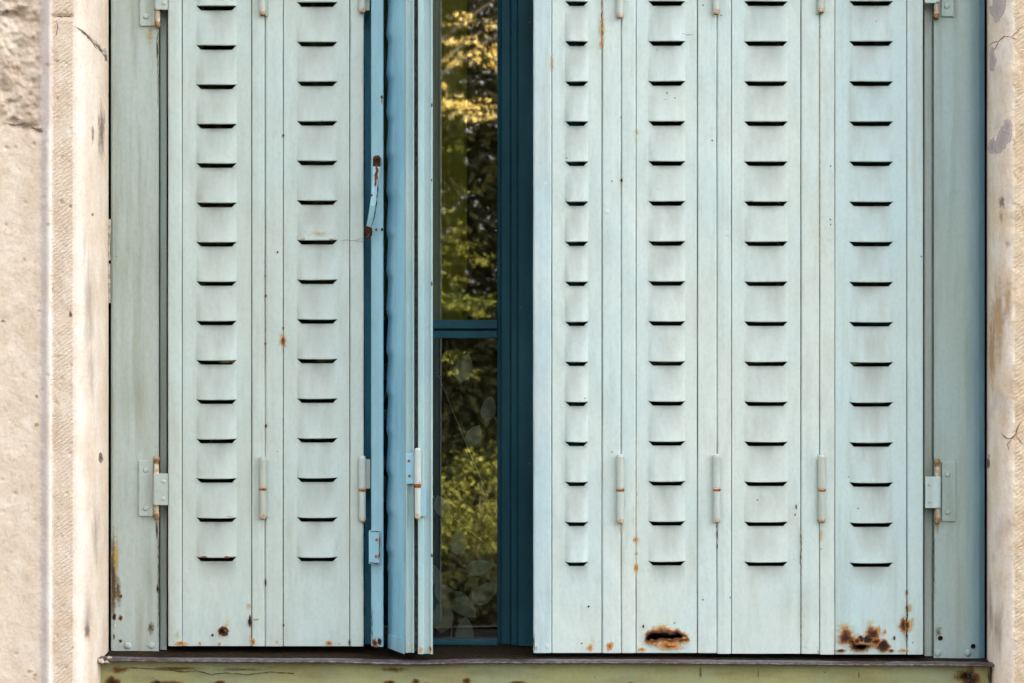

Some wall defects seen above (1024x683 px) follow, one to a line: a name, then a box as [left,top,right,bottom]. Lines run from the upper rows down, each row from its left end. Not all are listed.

peeling [990,0,1006,23]
peeling [988,120,1012,153]
corrosion [371,164,383,231]
corrosion [111,540,122,642]
corrosion [836,590,913,653]